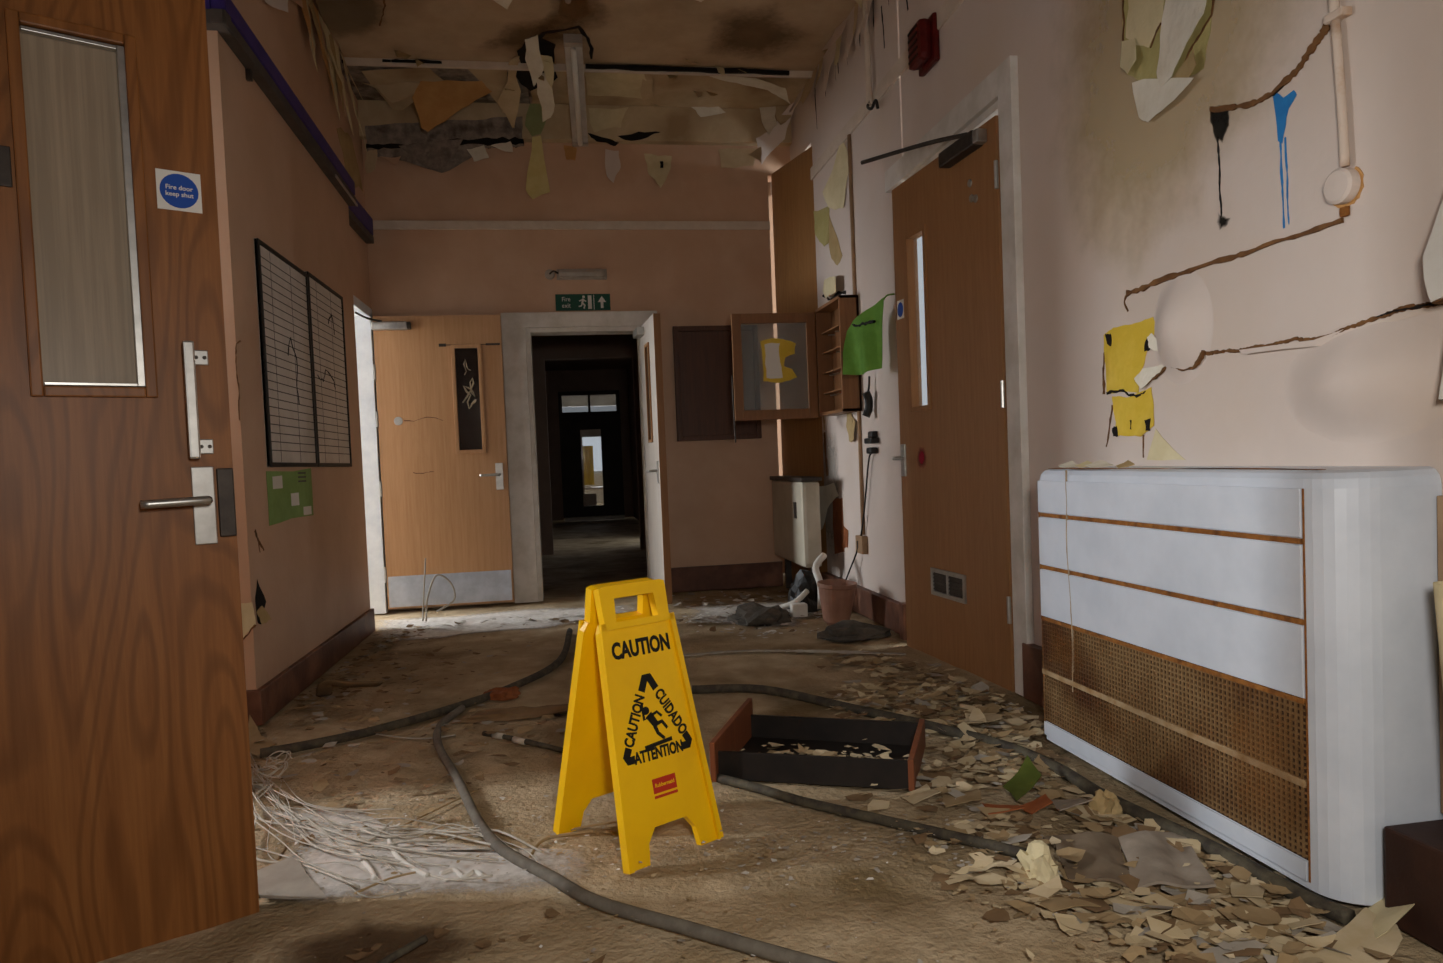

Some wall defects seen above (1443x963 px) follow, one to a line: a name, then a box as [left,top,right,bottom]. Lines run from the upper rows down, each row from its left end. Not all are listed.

spalling [516,35,558,91]
peeling [1120,0,1215,122]
crack [1209,23,1331,112]
flaking render [365,116,524,174]
flaking render [588,107,672,188]
crack [1124,217,1344,312]
crack [1205,301,1443,356]
peeling [1075,317,1185,468]